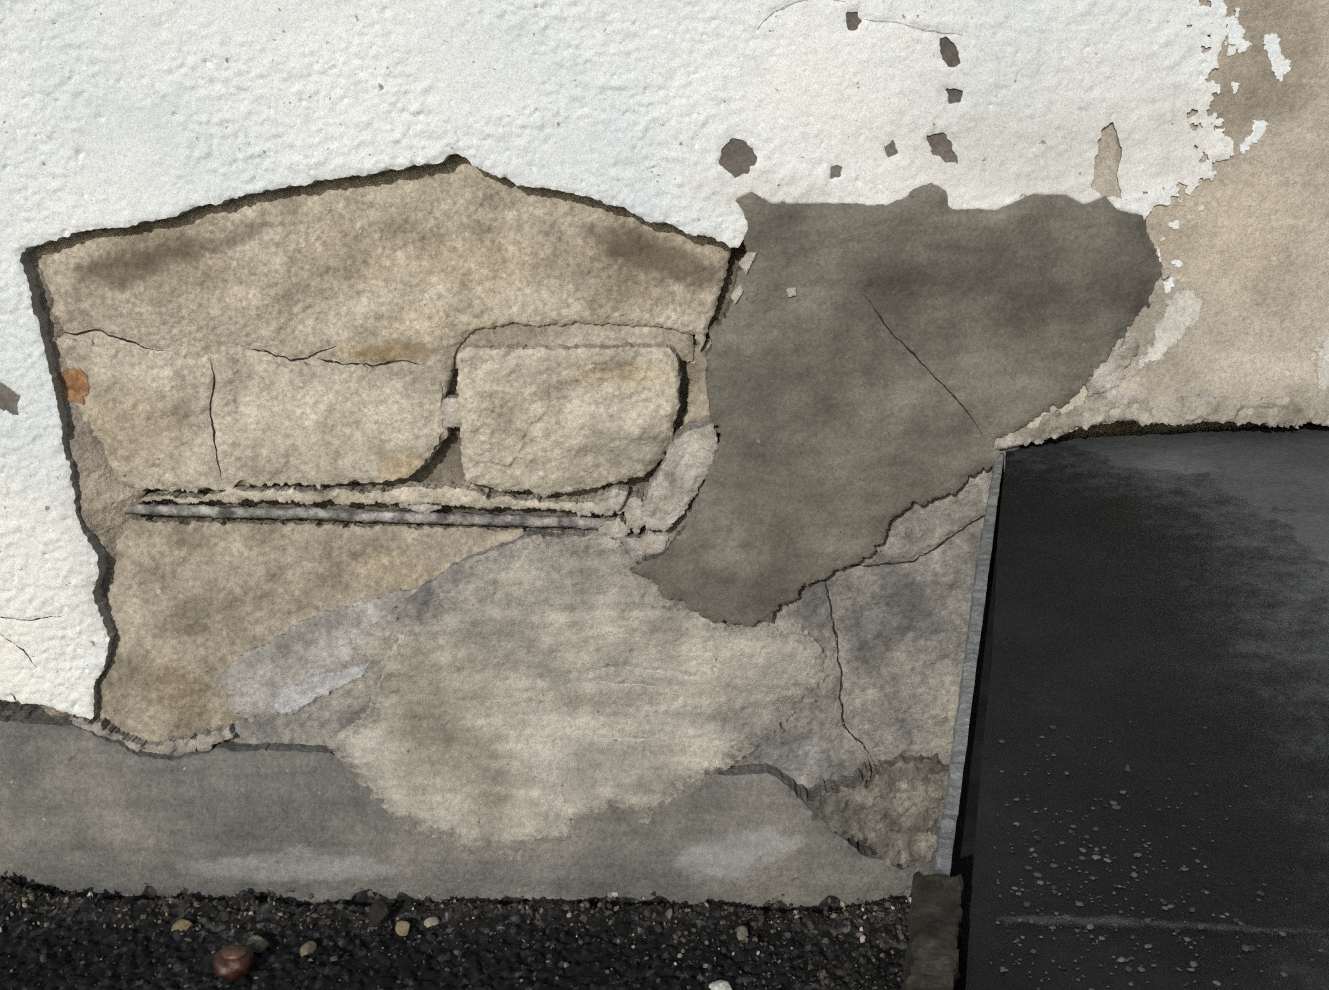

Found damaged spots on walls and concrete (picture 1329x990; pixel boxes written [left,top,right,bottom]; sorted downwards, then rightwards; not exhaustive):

peeling [719,138,757,178]
peeling [830,165,843,179]
flaking render [1069,0,1329,432]
peeling [0,382,27,415]
rust [58,368,89,405]
flaking render [31,154,746,756]
crack [863,294,983,436]
flaking render [1025,376,1092,438]
crack [825,514,985,764]
spalling [800,753,964,990]